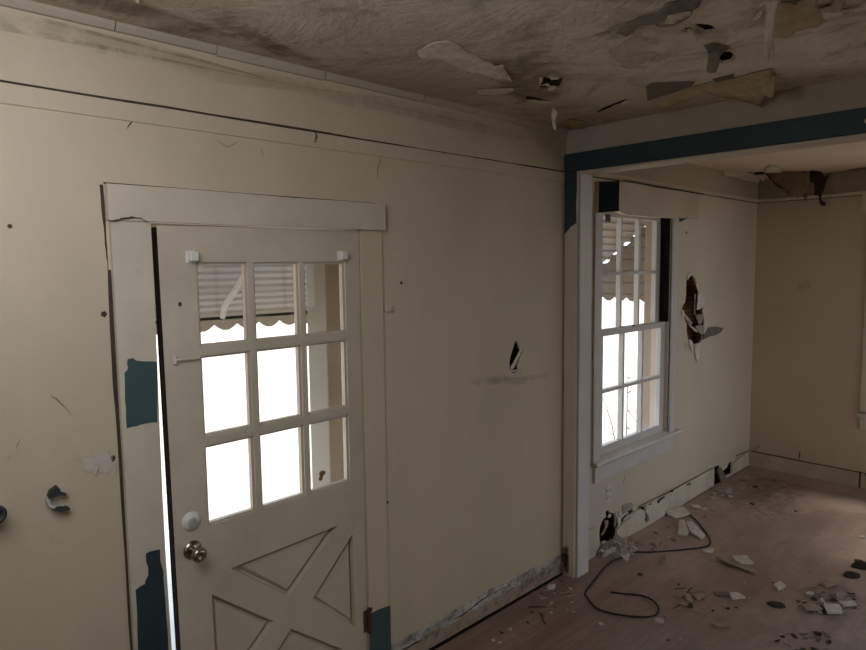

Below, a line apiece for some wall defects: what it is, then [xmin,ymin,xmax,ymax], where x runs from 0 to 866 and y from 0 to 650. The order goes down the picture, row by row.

peeling [589,0,716,38]
peeling [417,40,514,96]
peeling [646,0,845,112]
spalling [526,76,585,130]
spalling [681,272,723,362]
spalling [510,340,523,375]
peeling [124,358,157,428]
spalling [714,462,731,482]
spalling [599,490,673,544]
peeling [136,549,168,650]
flaking render [369,554,563,650]